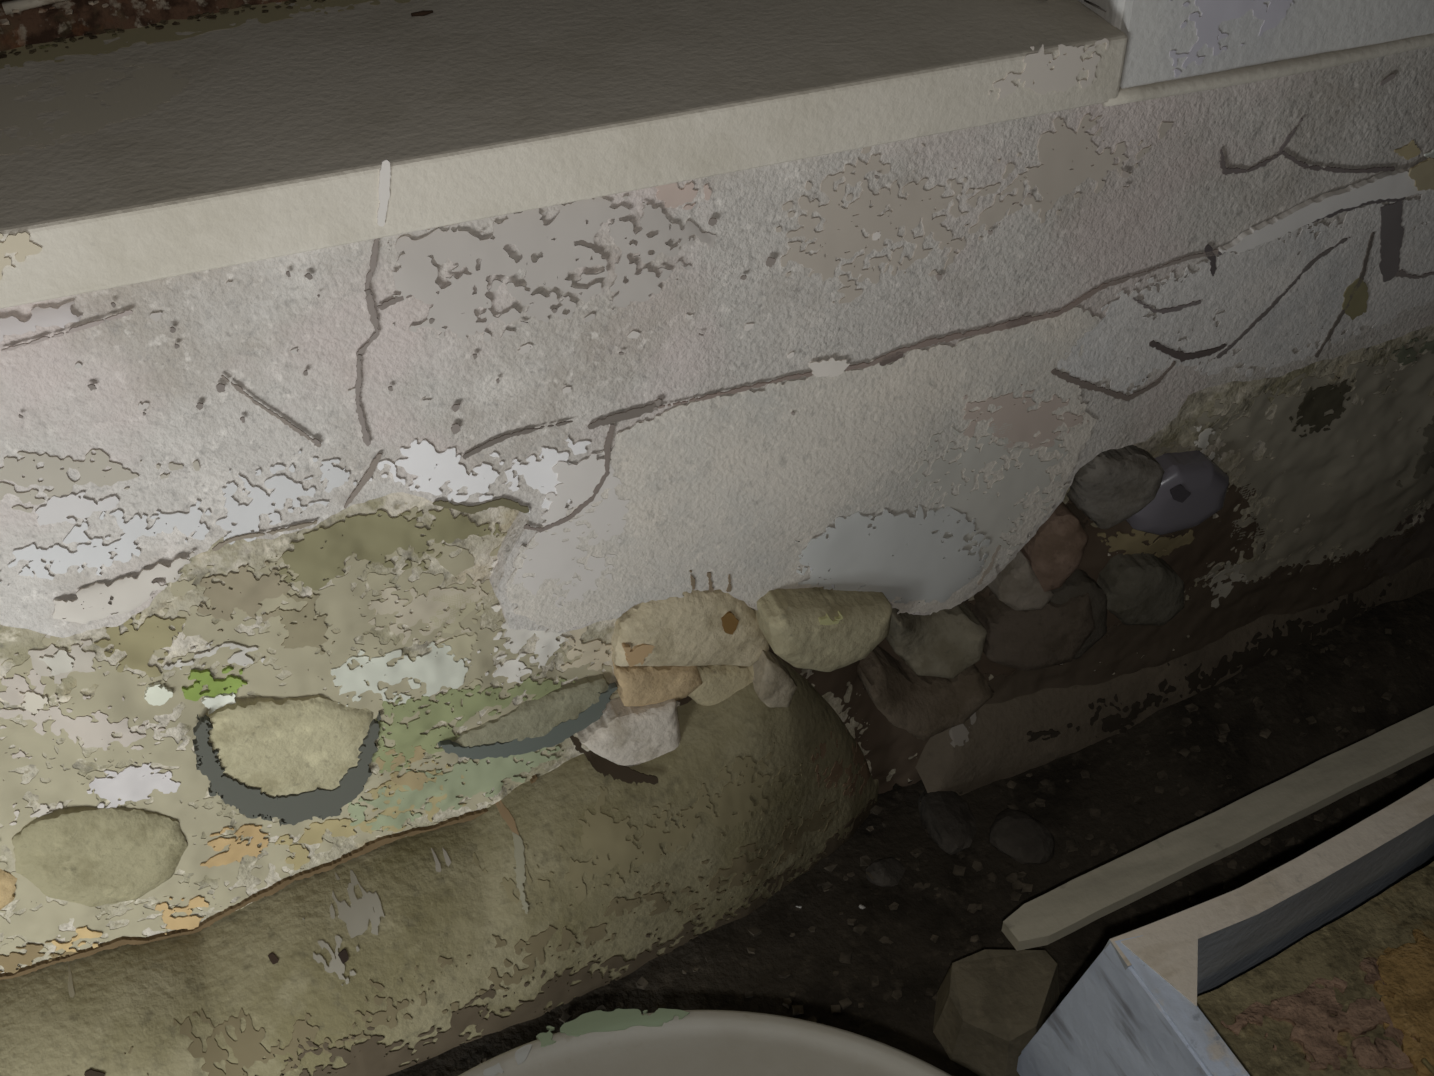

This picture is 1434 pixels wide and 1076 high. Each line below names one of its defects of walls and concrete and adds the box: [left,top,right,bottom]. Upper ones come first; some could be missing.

crack [212,238,413,551]
crack [432,118,1434,533]
leakage [1289,376,1354,438]
spalling [0,506,620,958]
spalling [769,645,930,794]